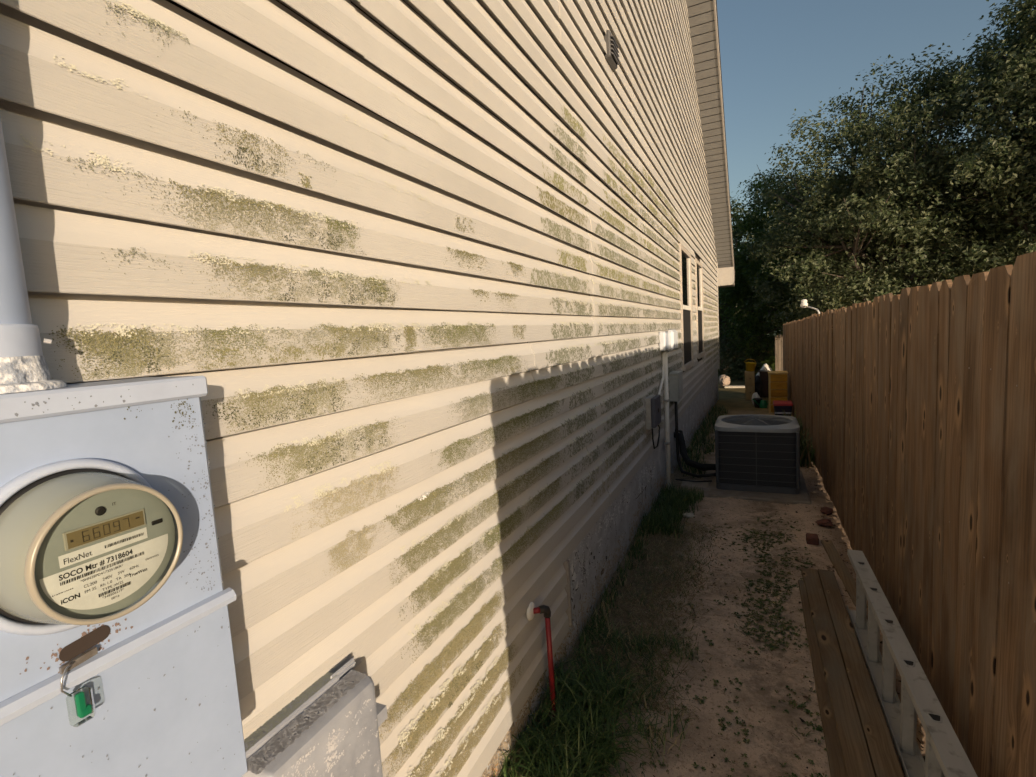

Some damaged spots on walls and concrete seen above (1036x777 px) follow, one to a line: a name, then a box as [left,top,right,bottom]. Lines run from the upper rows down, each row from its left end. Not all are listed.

damp [282,228,347,250]
damp [268,275,395,306]
damp [87,337,169,375]
mould [202,335,404,370]
mould [212,385,350,430]
damp [303,430,387,473]